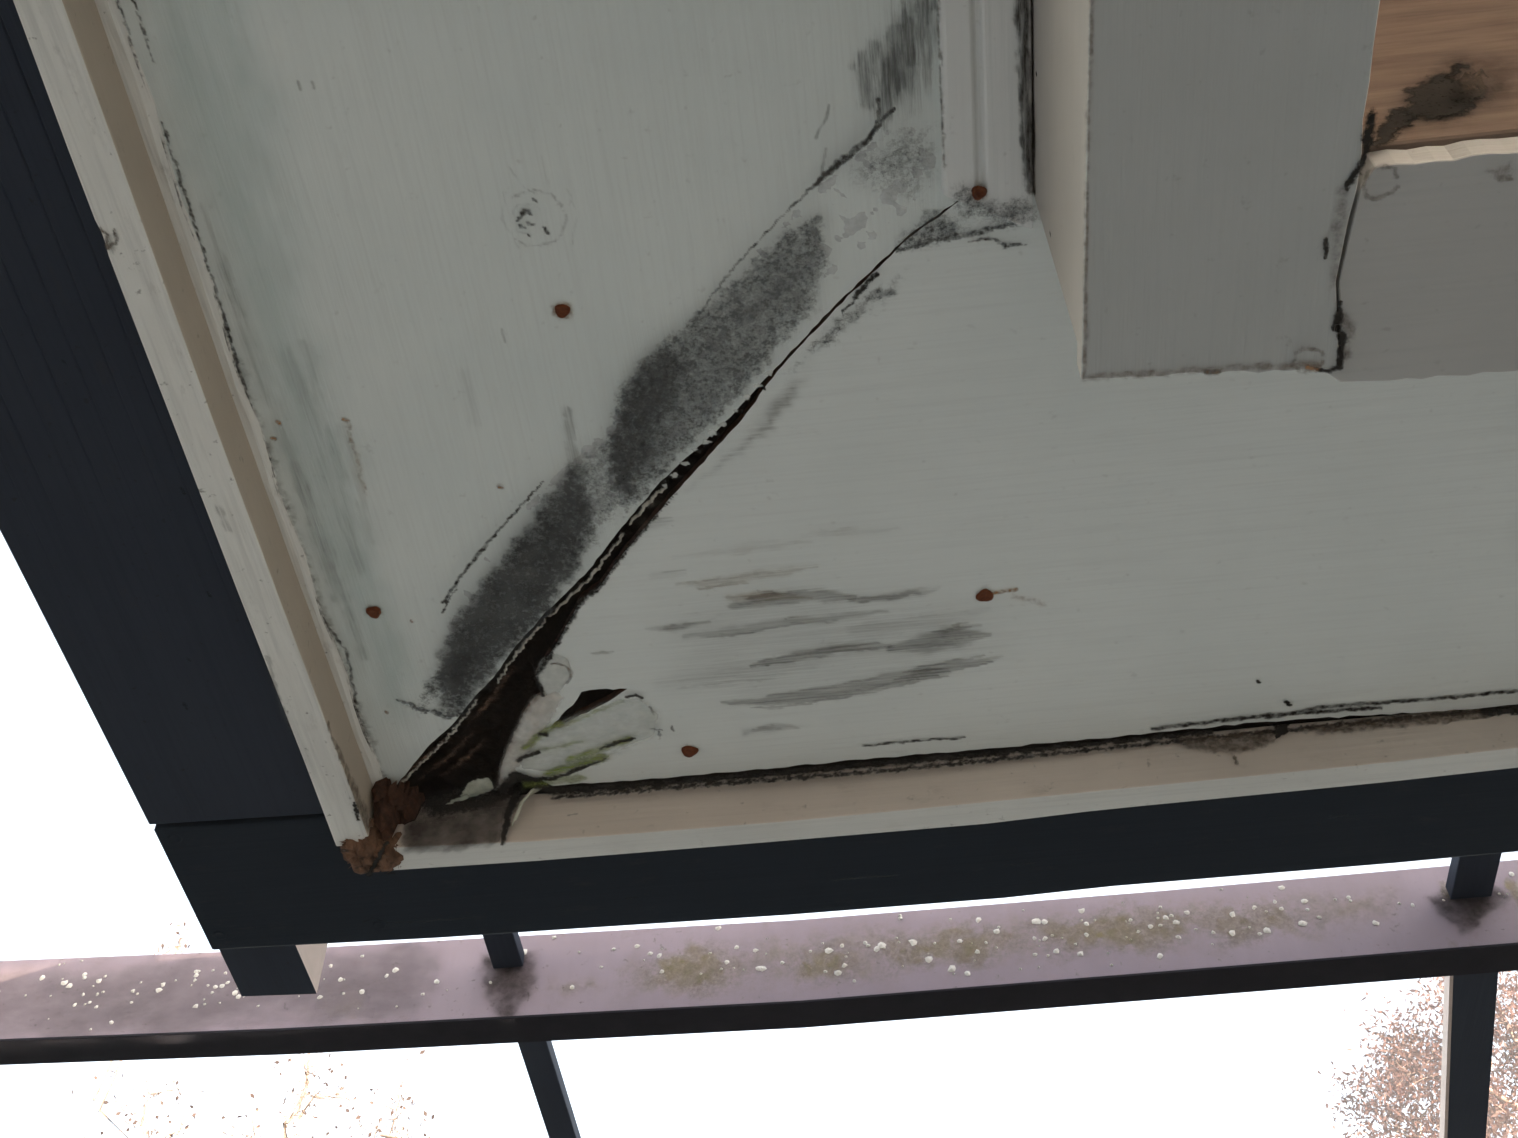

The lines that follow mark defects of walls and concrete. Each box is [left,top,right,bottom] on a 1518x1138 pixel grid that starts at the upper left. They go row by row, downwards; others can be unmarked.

crack [697,98,896,319]
leakage [813,272,895,347]
leakage [895,0,1037,253]
crack [1322,237,1330,260]
crack [1305,300,1350,373]
crack [1344,109,1376,191]
leakage [396,216,827,720]
peeling [497,371,772,684]
crack [397,375,1516,800]
peeling [401,700,477,782]
peeling [447,655,674,826]